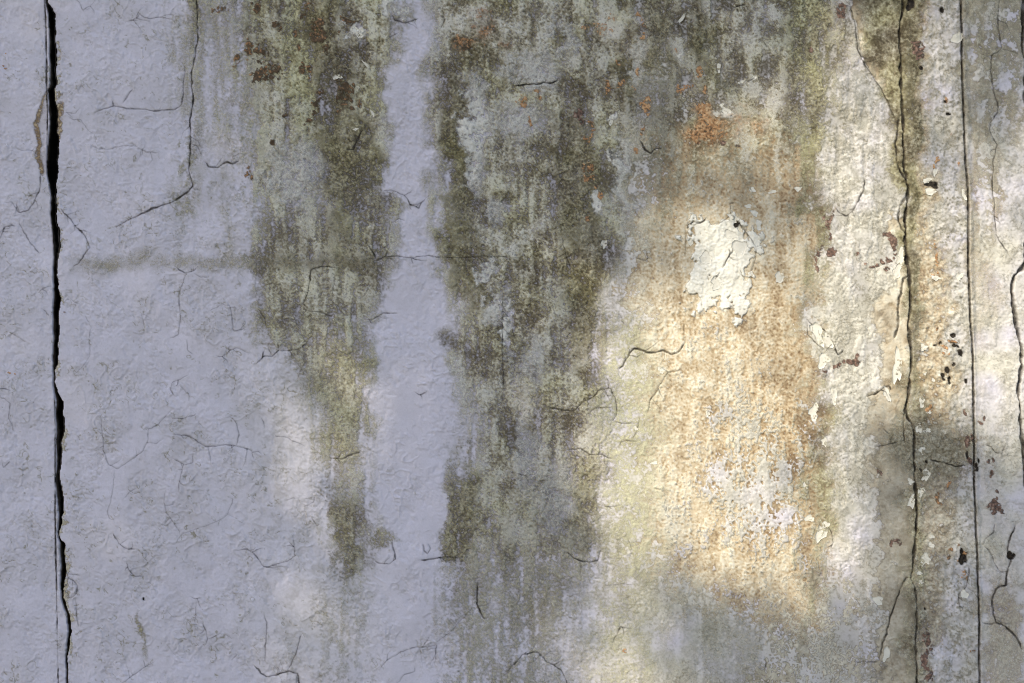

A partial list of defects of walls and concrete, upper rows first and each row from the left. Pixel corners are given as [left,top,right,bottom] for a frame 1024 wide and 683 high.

crack [130,0,236,219]
rust [232,37,283,83]
rust [272,2,362,126]
peeling [452,78,537,189]
rust [676,66,741,145]
crack [3,0,84,683]
leakage [88,0,411,577]
peeling [473,256,513,354]
crack [620,345,684,368]
leakage [418,0,972,683]
peeling [606,0,1024,683]
crack [869,0,1024,683]